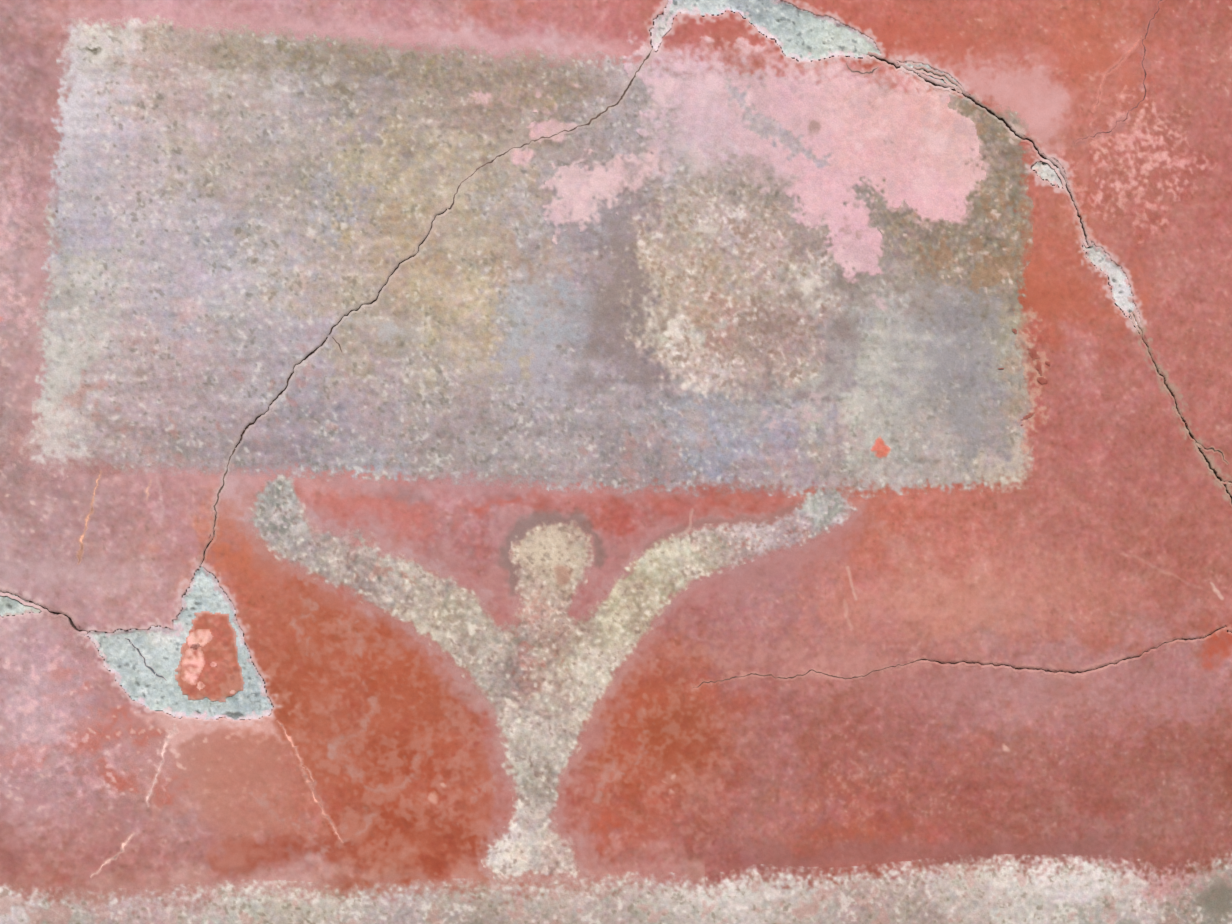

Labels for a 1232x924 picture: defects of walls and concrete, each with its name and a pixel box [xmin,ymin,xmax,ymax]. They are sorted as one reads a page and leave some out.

flaking render [524,0,986,287]
crack [867,0,1166,248]
peeling [1032,76,1218,246]
crack [197,47,655,567]
spalling [1083,242,1140,326]
crack [1130,311,1232,508]
crack [75,470,103,565]
crack [0,588,88,635]
spalling [83,567,273,721]
crack [692,624,1232,691]